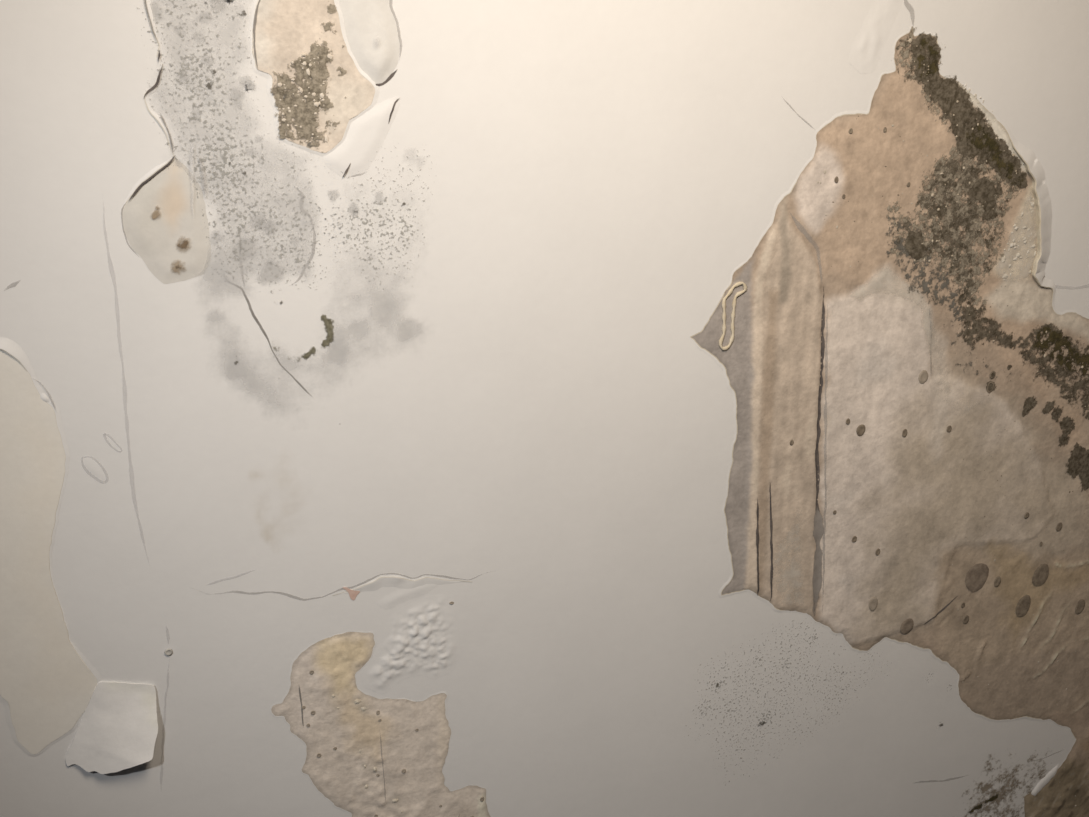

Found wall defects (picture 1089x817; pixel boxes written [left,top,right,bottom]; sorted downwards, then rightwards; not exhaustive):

peeling [0,337,158,774]
peeling [121,0,211,284]
mould [142,0,425,292]
peeling [249,0,401,178]
mould [302,315,357,362]
peeling [689,25,1089,817]
mould [886,26,1089,491]
peeling [270,631,492,817]
mould [965,761,1044,817]